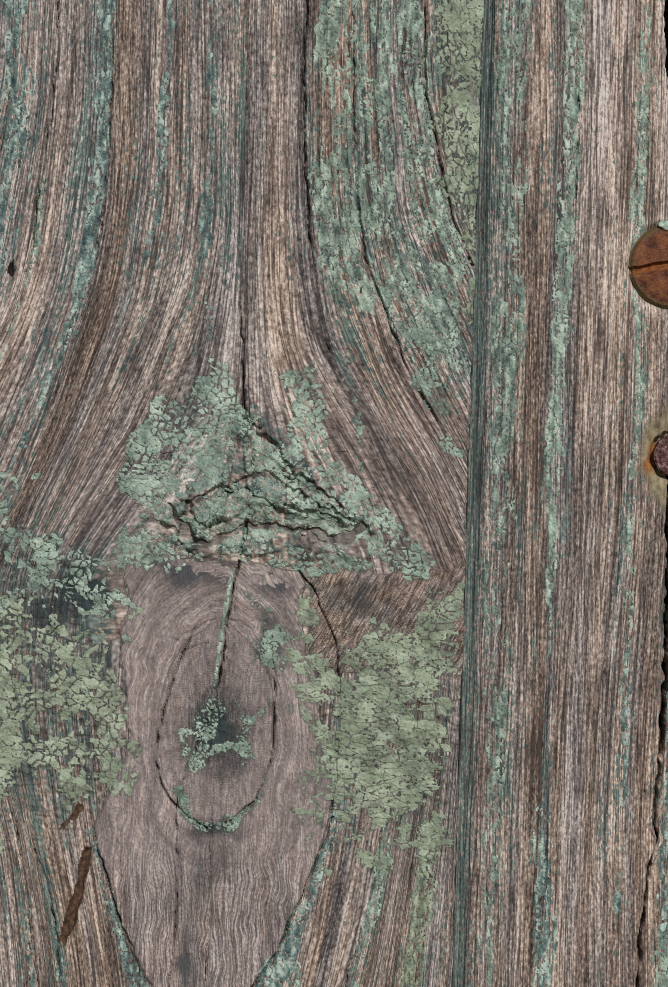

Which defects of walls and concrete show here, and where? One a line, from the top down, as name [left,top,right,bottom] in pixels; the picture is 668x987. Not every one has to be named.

crack [660,0,668,89]
corrosion [642,410,668,506]
crack [295,578,339,676]
crack [658,475,668,728]
crack [155,564,239,852]
crack [225,668,276,823]